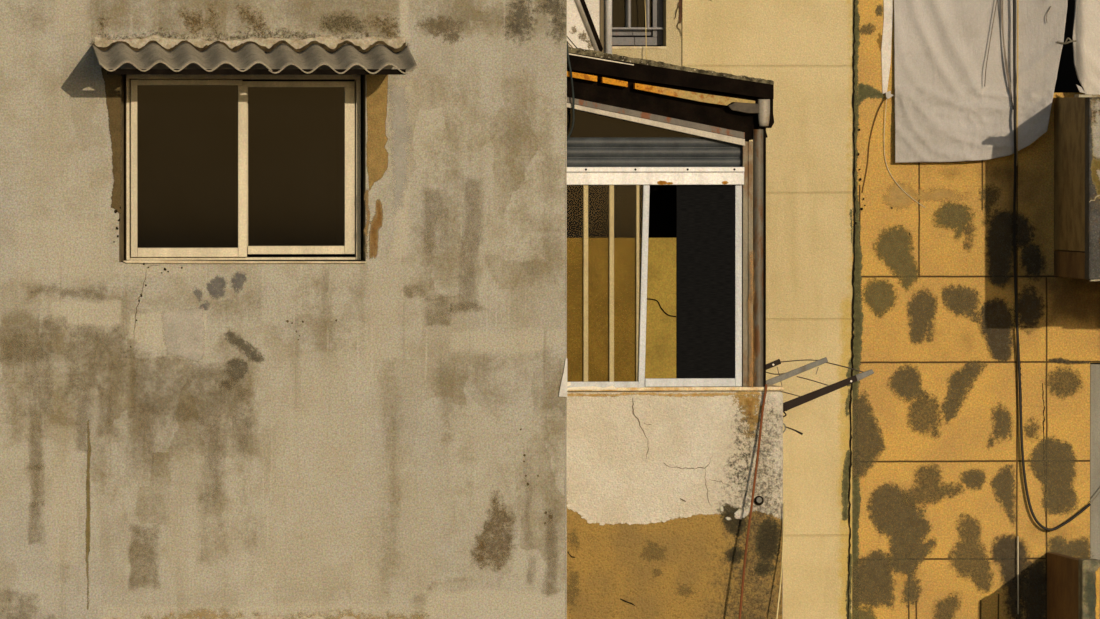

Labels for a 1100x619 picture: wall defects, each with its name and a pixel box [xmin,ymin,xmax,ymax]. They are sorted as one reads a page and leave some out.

damp [90,5,408,46]
flaking render [366,75,388,190]
peeling [1090,98,1100,198]
damp [841,0,1096,619]
crack [632,400,728,504]
damp [471,497,514,571]
peeling [567,495,783,619]
damp [718,410,783,619]